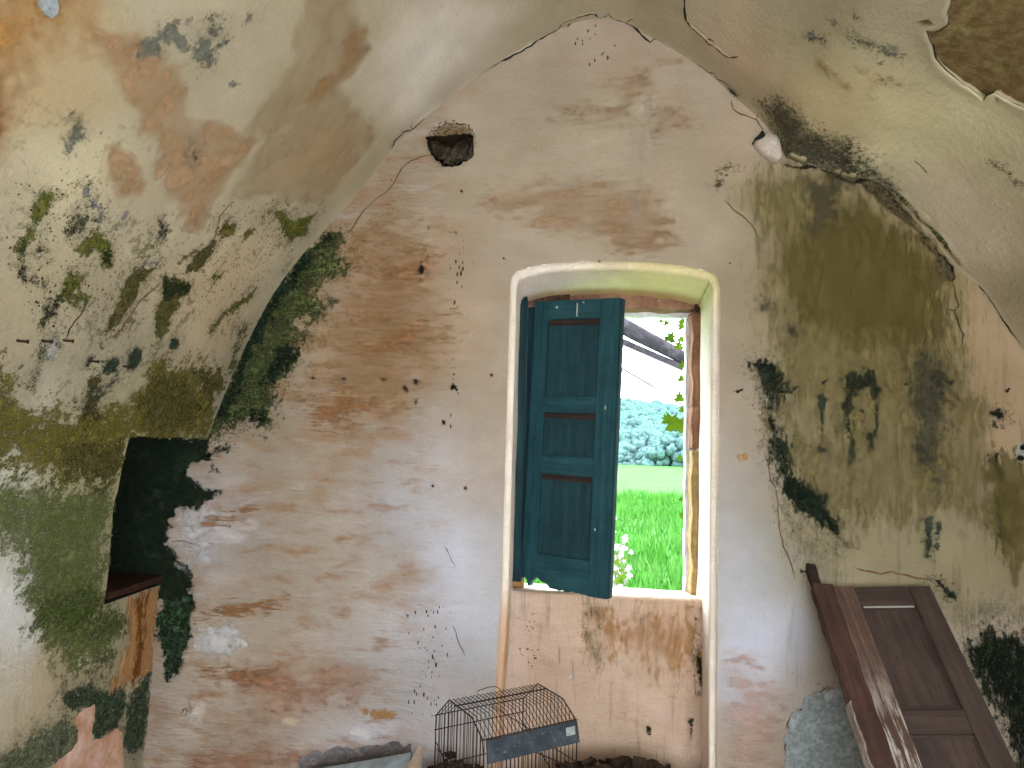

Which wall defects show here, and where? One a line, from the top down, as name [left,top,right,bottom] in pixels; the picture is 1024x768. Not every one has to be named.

crack [480,12,660,75]
spalling [911,0,1024,121]
leakage [96,0,371,308]
crack [339,120,431,234]
leakage [6,112,129,393]
leakage [74,345,147,430]
leakage [738,94,1024,602]
crack [768,448,796,580]
leakage [108,435,448,768]
leakage [690,606,702,696]
flaking render [52,704,124,768]
flaking render [784,683,865,768]